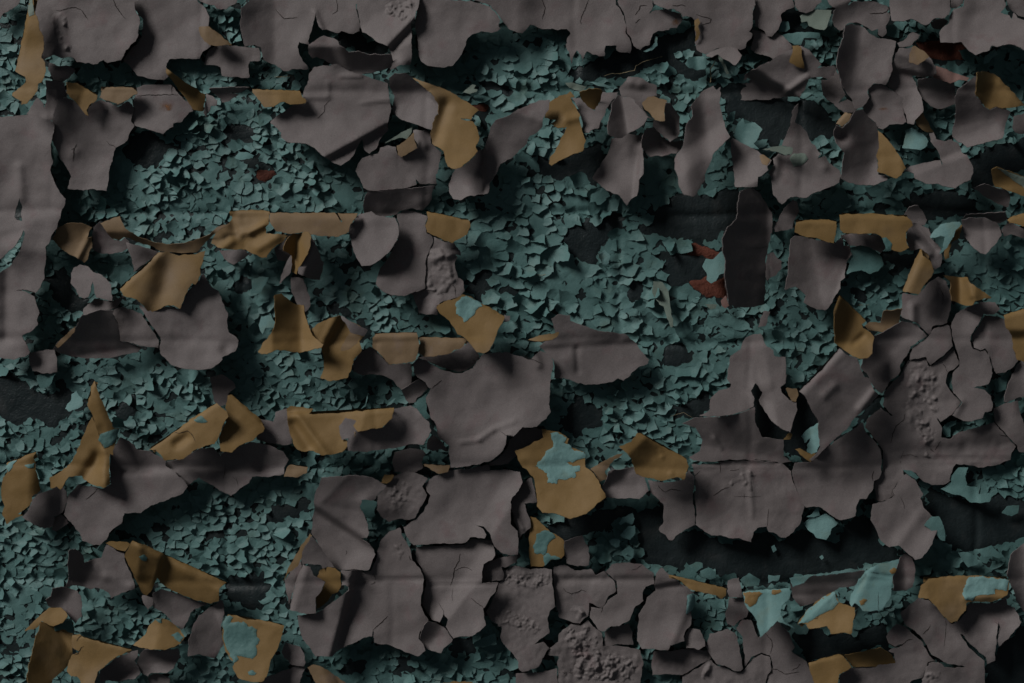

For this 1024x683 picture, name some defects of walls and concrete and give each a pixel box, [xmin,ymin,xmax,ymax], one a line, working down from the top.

peeling [902,128,928,150]
peeling [602,433,689,499]
peeling [25,586,170,683]
peeling [66,541,171,648]
peeling [124,541,236,683]
peeling [222,614,306,683]
peeling [486,562,673,683]
peeling [637,568,741,651]
peeling [651,628,771,683]
peeling [725,587,814,683]
peeling [900,583,1024,683]
peeling [918,543,1024,623]